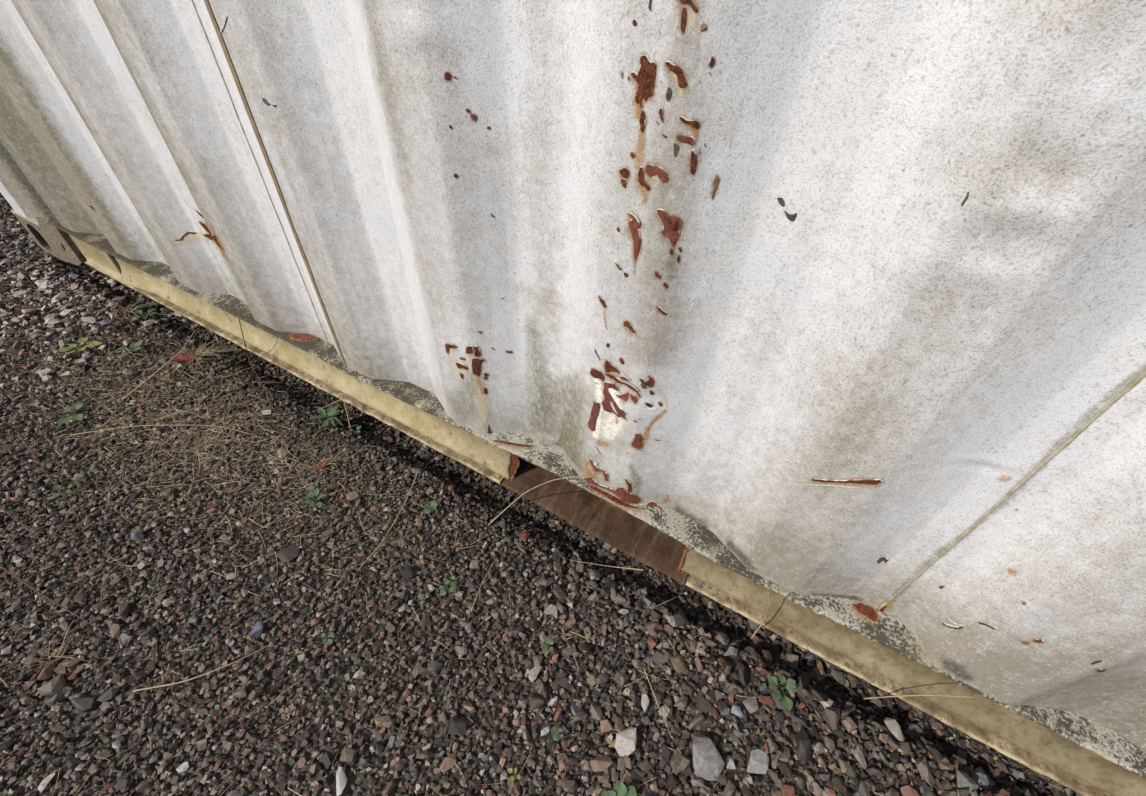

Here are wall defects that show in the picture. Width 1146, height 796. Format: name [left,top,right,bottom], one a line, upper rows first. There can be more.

peeling [676,0,707,33]
peeling [619,53,706,263]
peeling [196,211,223,255]
peeling [614,211,642,277]
peeling [588,343,667,450]
corrosion [852,602,890,623]
peeling [942,615,965,630]